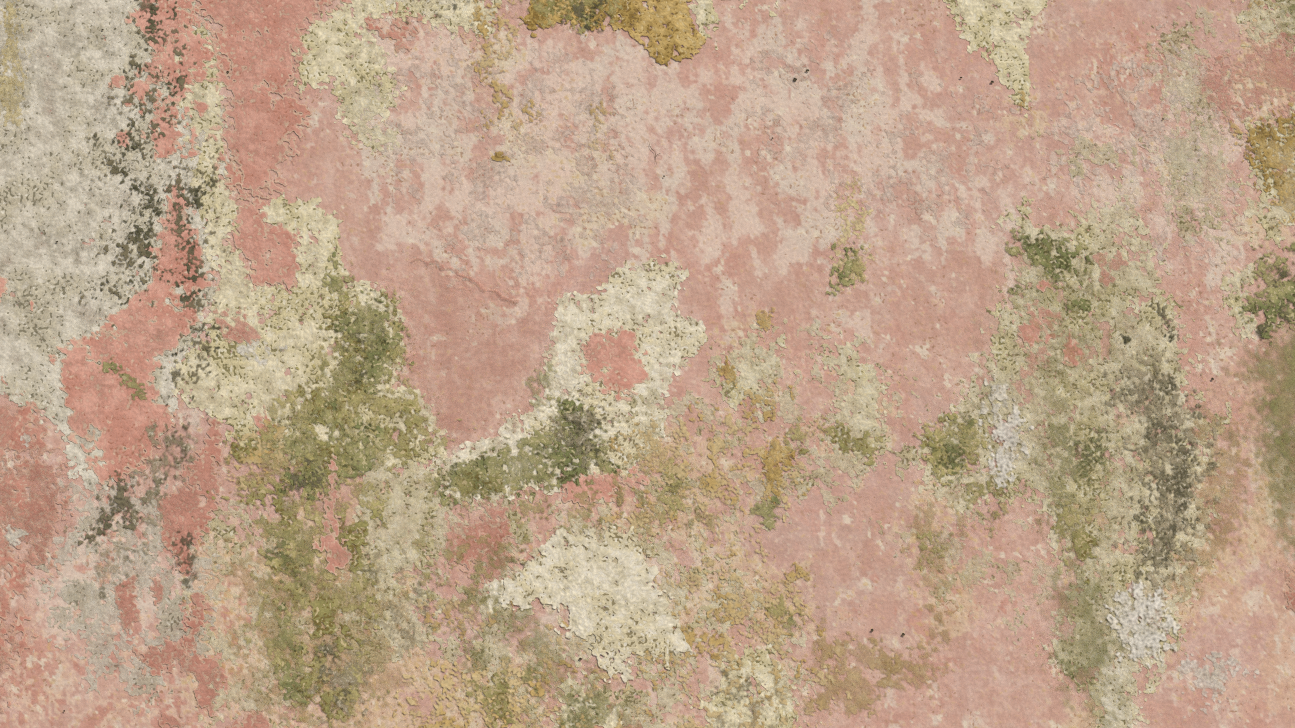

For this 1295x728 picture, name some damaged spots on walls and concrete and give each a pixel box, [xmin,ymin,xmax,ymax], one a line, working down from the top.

peeling [688,0,721,50]
peeling [938,0,1055,144]
peeling [440,64,670,280]
water stain [562,382,614,465]
water stain [979,375,1035,489]
water stain [1100,302,1259,713]